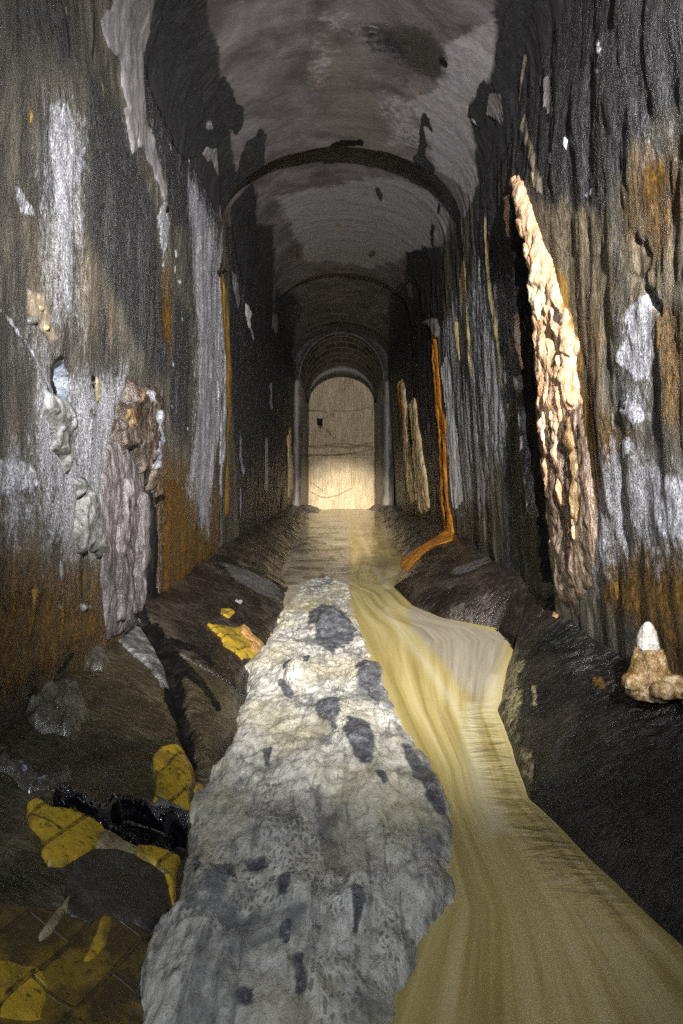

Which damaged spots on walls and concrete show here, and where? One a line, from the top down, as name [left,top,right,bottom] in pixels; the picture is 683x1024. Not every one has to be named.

efflorescence [48,103,74,323]
hole [91,376,101,402]
spalling [112,380,166,491]
corrosion [217,262,232,516]
corrosion [400,335,454,571]
efflorescence [620,400,645,423]
efflorescence [616,295,653,381]